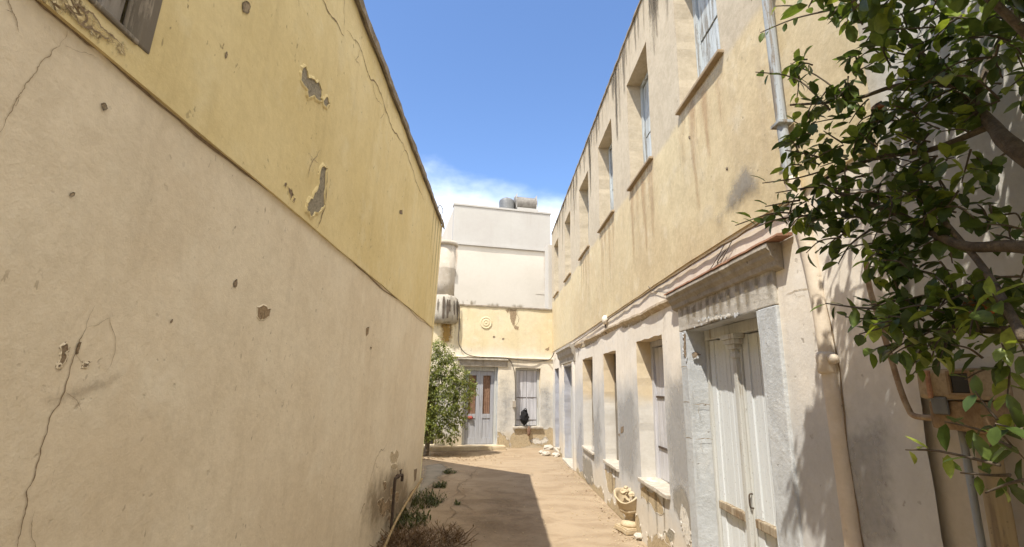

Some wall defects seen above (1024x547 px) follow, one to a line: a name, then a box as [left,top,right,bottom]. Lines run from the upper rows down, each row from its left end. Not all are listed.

peeling [48,0,126,55]
crack [0,0,268,191]
spalling [299,64,331,111]
crack [323,0,425,202]
spalling [284,163,328,220]
spalling [256,304,271,321]
crack [353,262,432,328]
spalling [55,342,90,370]
crack [17,315,116,547]